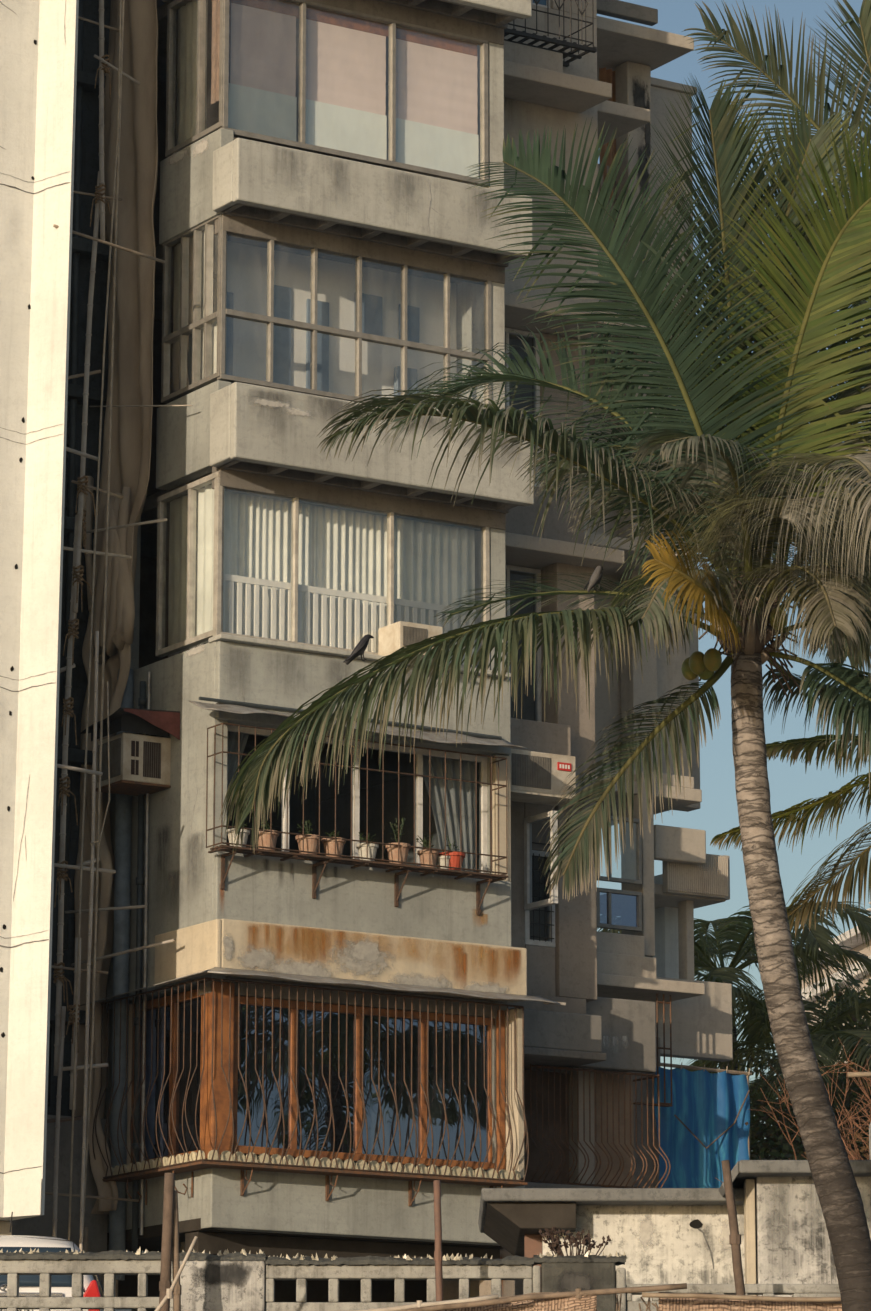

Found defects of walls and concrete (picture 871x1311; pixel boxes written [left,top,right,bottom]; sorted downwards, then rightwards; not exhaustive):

corrosion [154,919,527,1003]